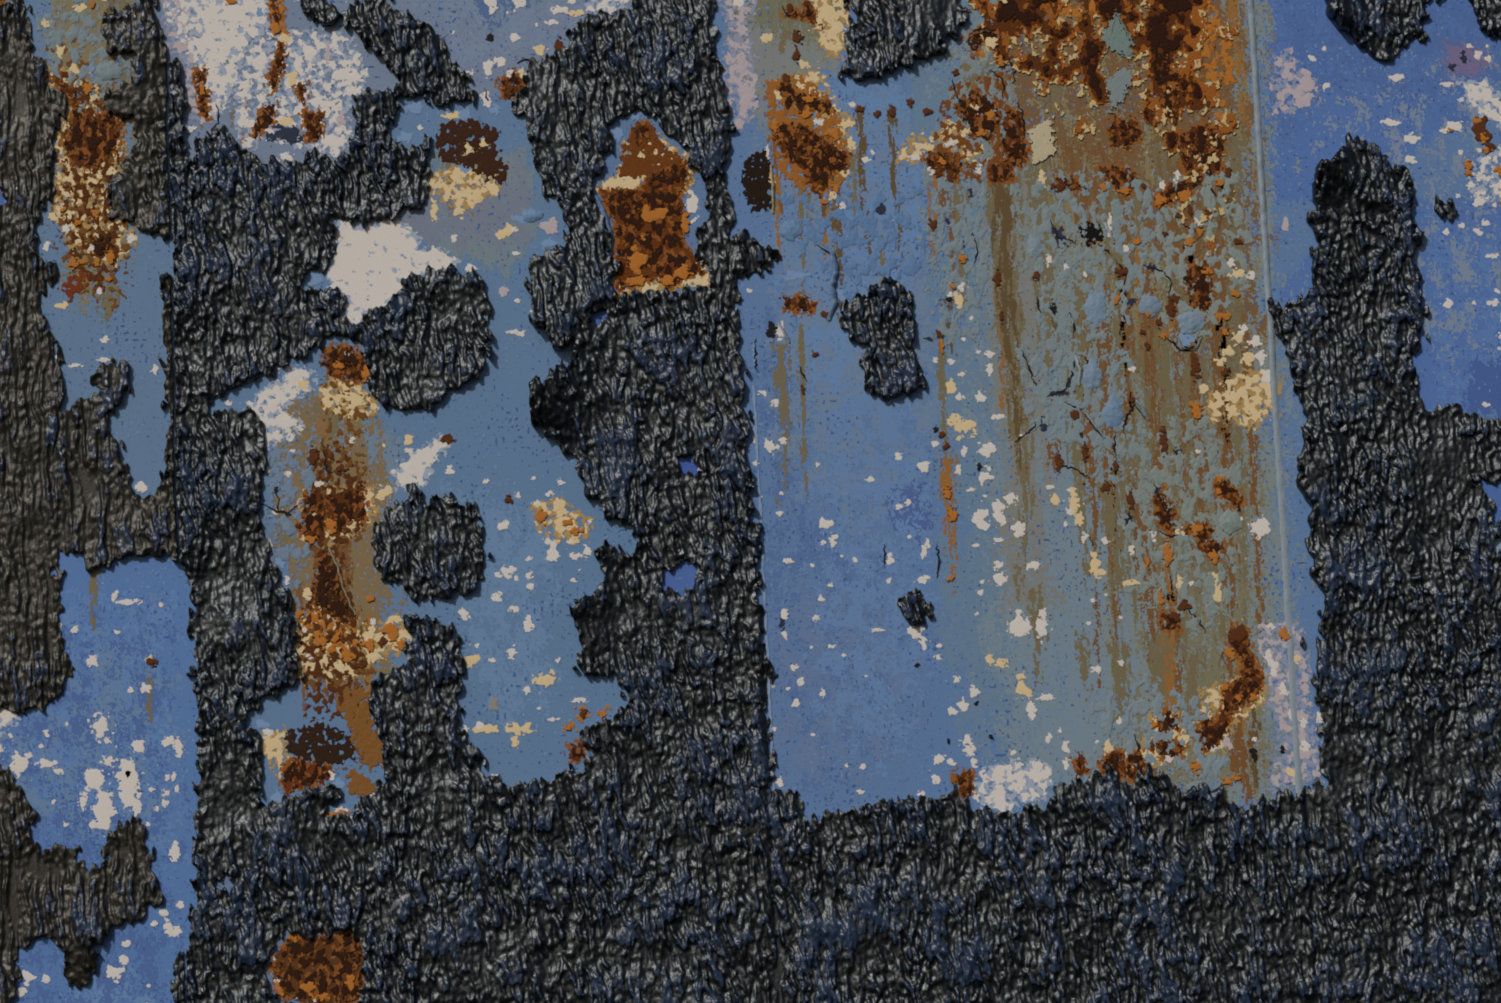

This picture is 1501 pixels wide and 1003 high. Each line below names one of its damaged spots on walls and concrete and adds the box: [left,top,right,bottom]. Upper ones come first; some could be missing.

corrosion [44,30,135,329]
corrosion [435,116,509,217]
corrosion [593,118,708,302]
peeling [1380,50,1501,207]
peeling [5,0,640,817]
peeling [591,0,1328,825]
corrosion [741,0,1291,805]
corrosion [273,340,409,817]
peeling [0,549,201,1003]
peeling [214,873,236,897]
corrosion [266,929,365,1003]